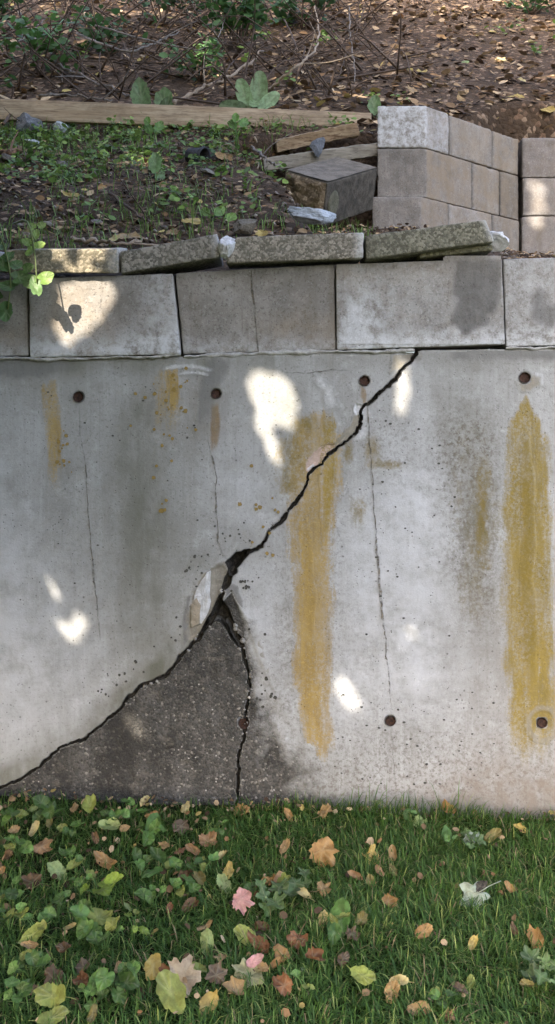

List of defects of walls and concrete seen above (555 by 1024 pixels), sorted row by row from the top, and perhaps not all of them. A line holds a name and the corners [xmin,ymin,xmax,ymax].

spalling [0,558,354,811]
crack [0,351,418,804]